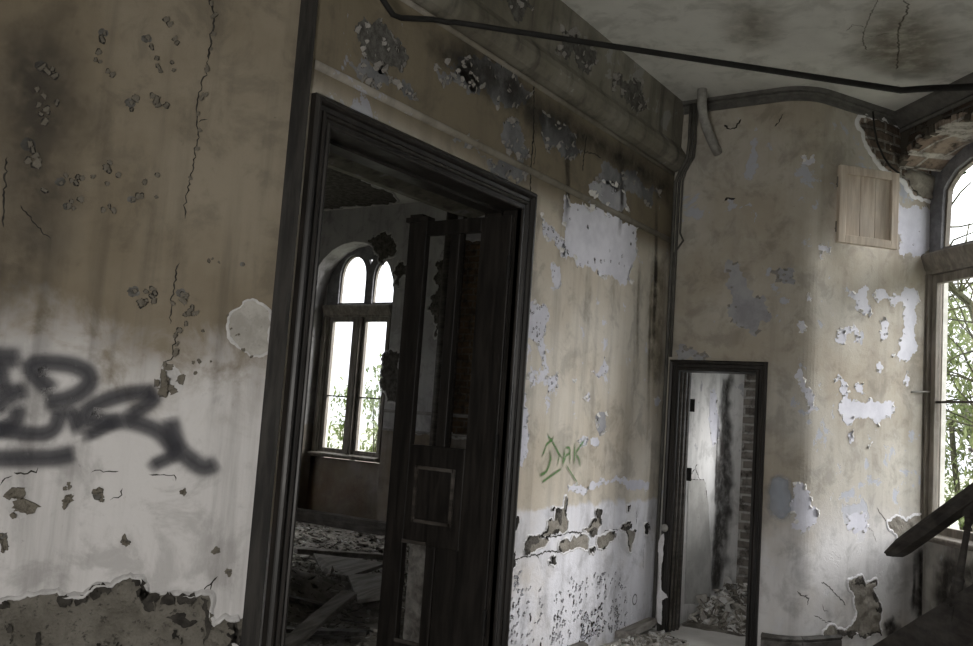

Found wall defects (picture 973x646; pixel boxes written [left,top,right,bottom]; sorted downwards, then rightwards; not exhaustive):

crack [846,0,910,69]
crack [183,0,218,216]
peeling [540,161,662,289]
crack [164,264,188,362]
flaking render [379,348,400,406]
peeling [848,285,921,387]
water stain [711,379,733,590]
flaking render [0,572,243,646]
crack [515,531,582,560]
flaking render [508,475,650,646]
peeling [657,534,668,624]
flaking render [821,573,883,640]